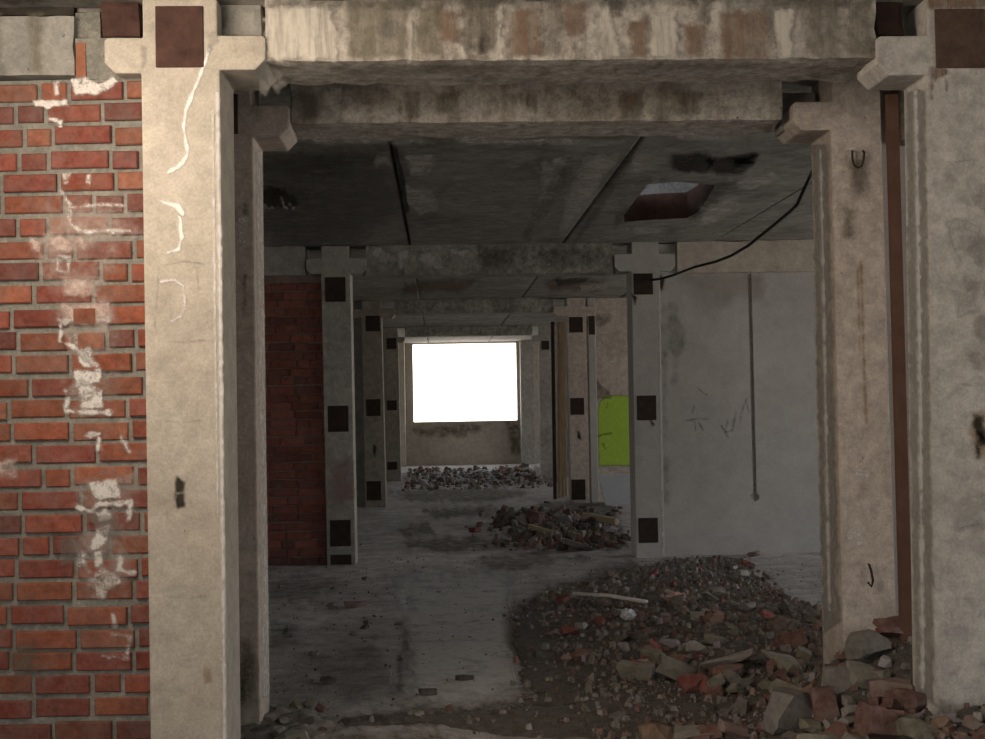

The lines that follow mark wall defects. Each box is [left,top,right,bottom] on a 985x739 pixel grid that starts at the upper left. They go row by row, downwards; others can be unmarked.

damp [673,153,775,188]
damp [811,145,863,631]
spalling [973,416,985,457]